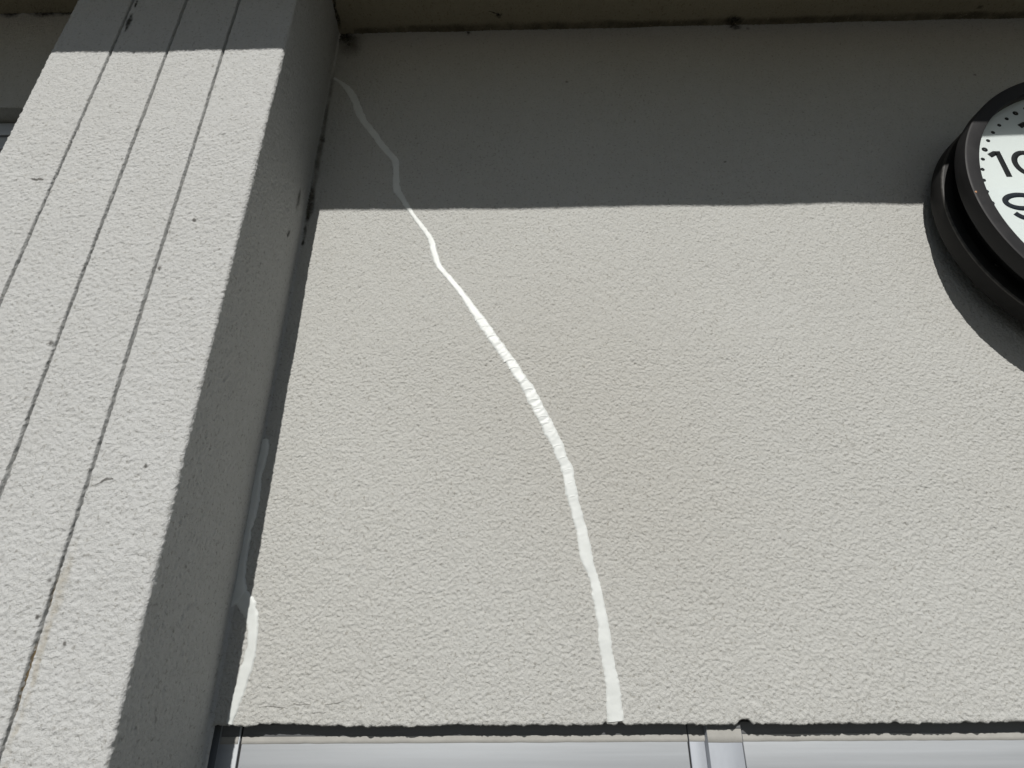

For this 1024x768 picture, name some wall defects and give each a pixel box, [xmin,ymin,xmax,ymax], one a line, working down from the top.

crack [226,439,270,725]
crack [333,77,624,722]